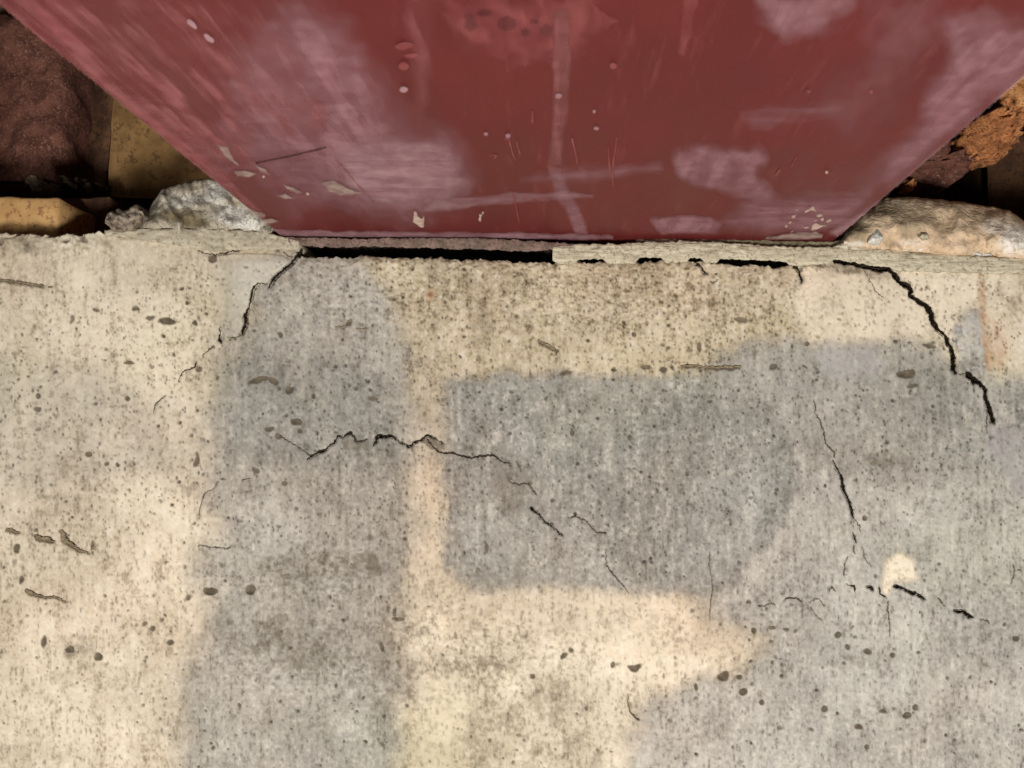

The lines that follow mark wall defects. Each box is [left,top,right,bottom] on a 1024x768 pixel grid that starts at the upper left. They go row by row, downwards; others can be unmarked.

crack [153,248,303,413]
crack [834,260,995,429]
crack [280,432,629,594]
crack [758,402,990,632]